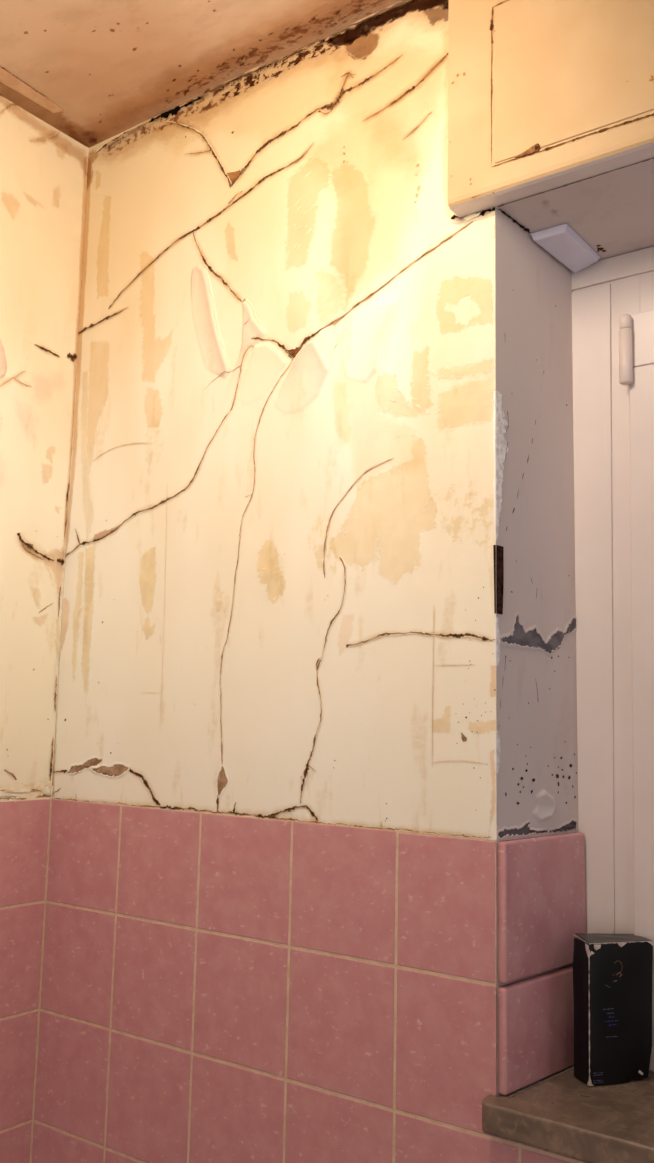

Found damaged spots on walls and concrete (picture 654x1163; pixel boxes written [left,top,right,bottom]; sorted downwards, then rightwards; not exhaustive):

damp [108,0,449,151]
crack [199,0,411,97]
crack [498,158,654,233]
peeling [435,275,495,335]
crack [0,53,473,760]
peeling [330,435,438,585]
peeling [374,343,577,698]
crack [49,458,495,838]